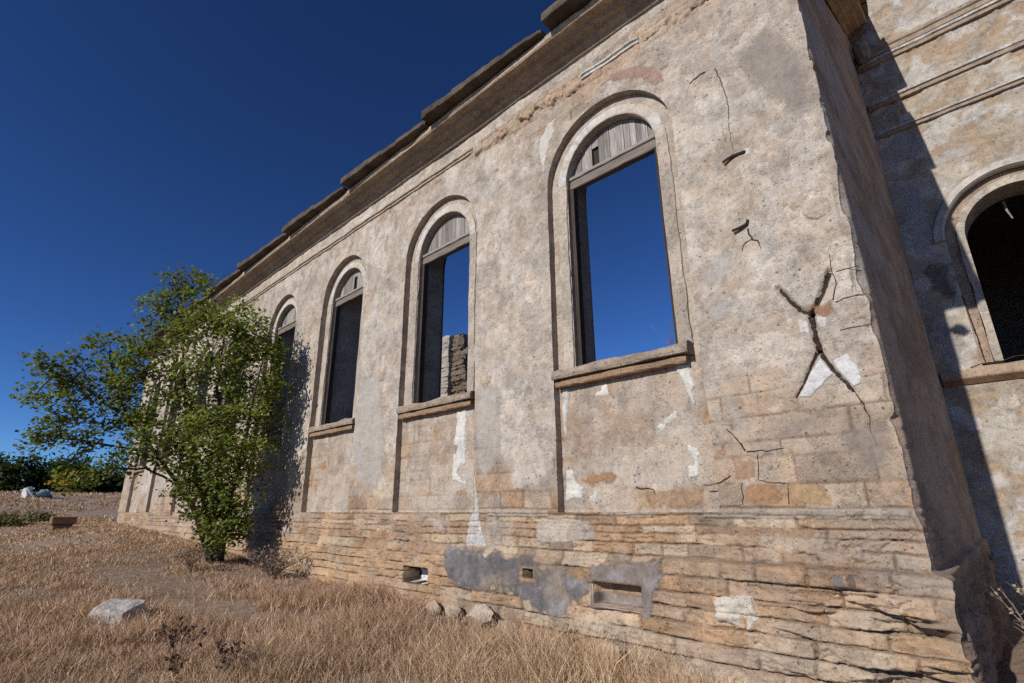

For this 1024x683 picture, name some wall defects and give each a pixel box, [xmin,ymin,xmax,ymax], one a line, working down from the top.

spalling [641,0,707,42]
spalling [601,66,662,85]
spalling [474,72,584,159]
peeling [539,119,555,172]
crack [742,228,761,250]
peeling [676,363,695,405]
crack [779,254,877,445]
peeling [799,354,862,398]
peeling [452,387,499,484]
peeling [565,469,615,503]
spalling [646,445,702,507]
crack [705,429,789,505]